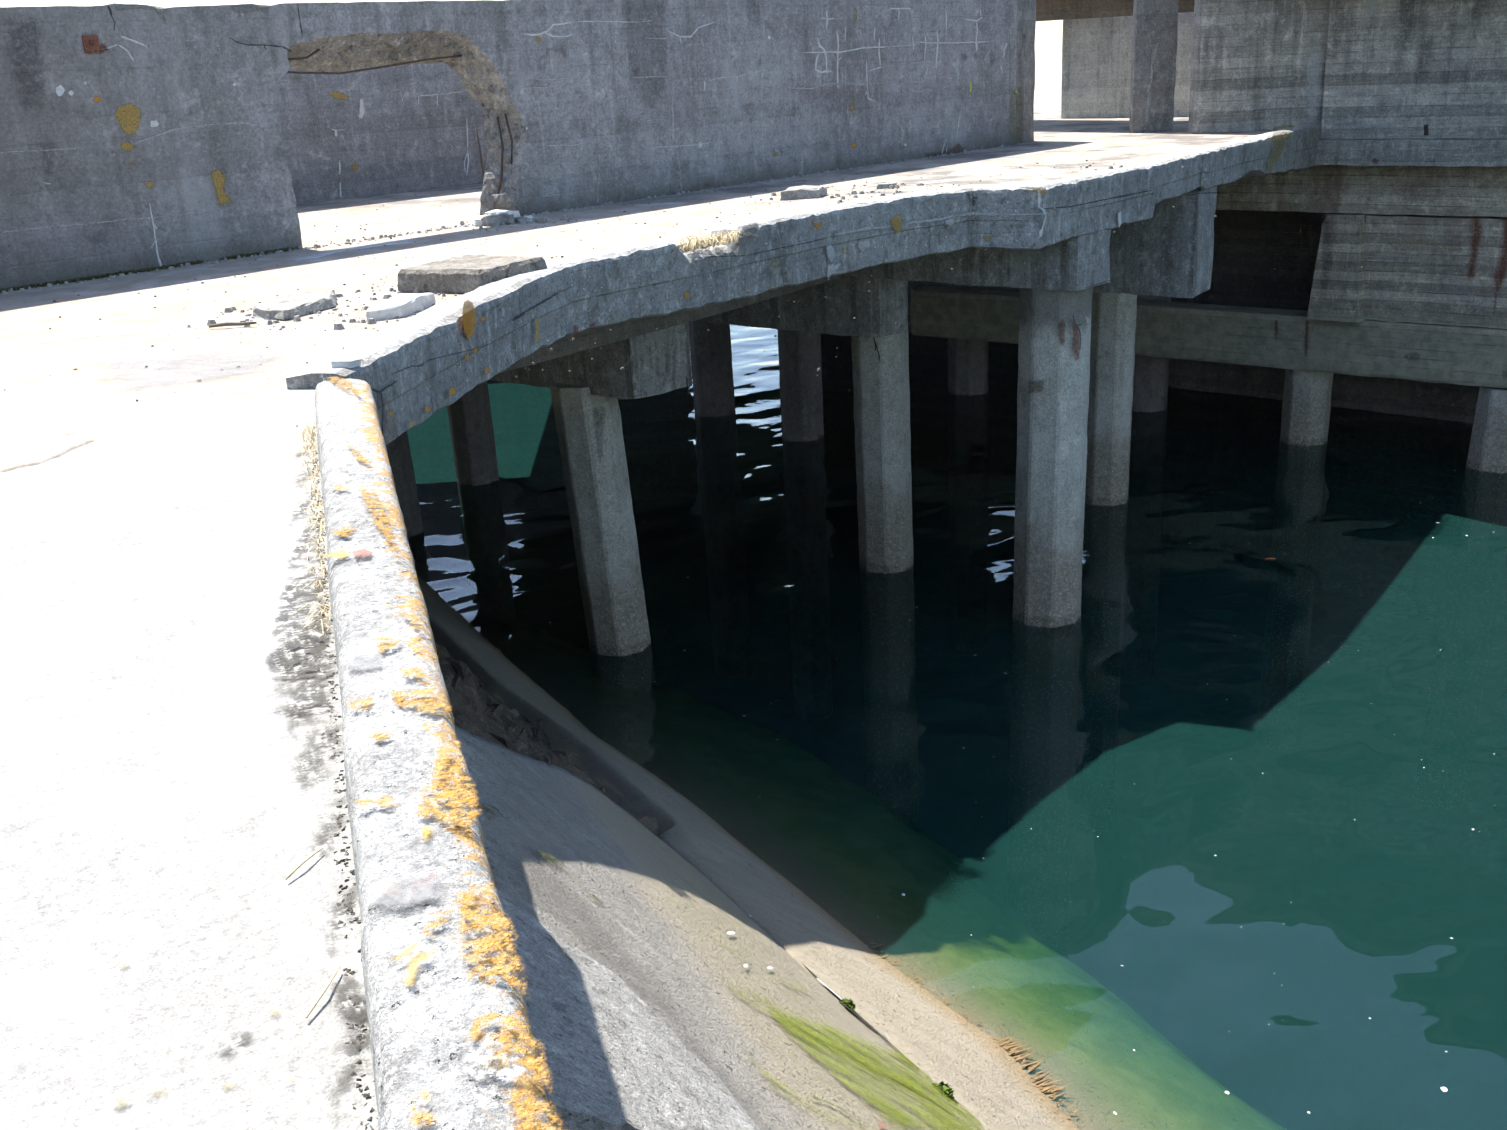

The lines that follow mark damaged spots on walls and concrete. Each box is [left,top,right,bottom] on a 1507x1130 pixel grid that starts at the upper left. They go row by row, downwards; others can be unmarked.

corrosion [1469,216,1480,276]
corrosion [1495,217,1507,292]
corrosion [1059,321,1080,359]